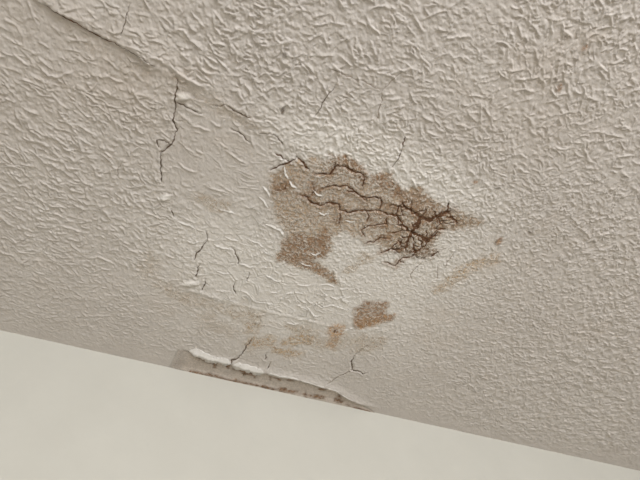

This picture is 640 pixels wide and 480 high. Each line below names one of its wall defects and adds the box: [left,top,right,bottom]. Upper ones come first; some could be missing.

crack [156,79,250,181]
crack [233,130,458,277]
water stain [270,155,481,284]
water stain [354,301,394,328]
peeling [175,348,374,413]